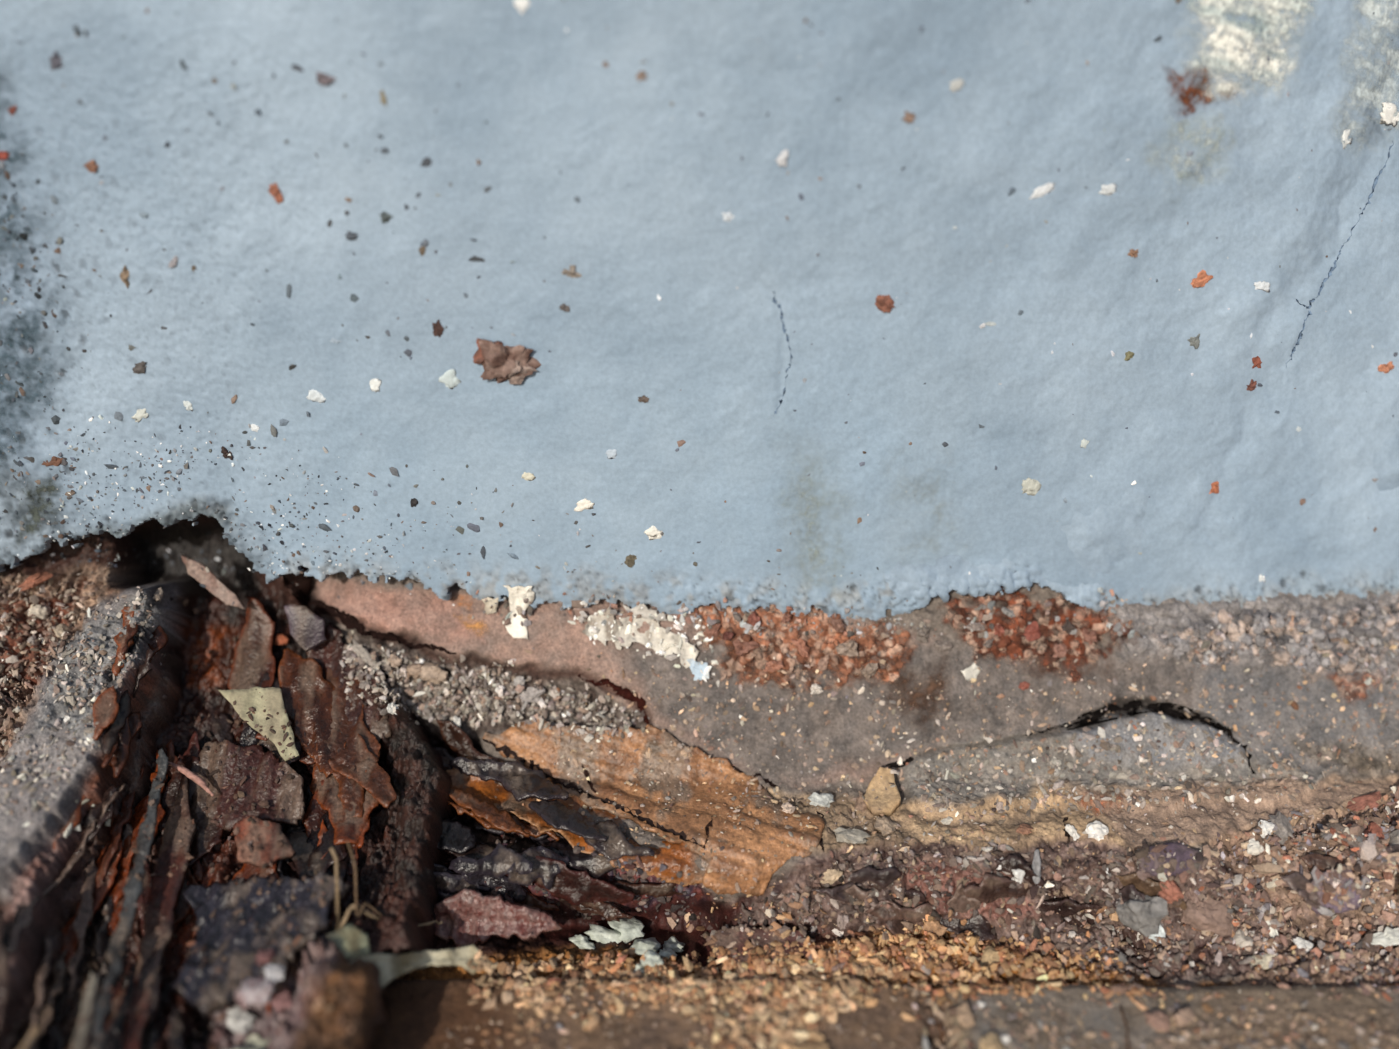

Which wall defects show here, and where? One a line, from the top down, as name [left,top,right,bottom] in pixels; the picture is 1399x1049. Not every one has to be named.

crack [1286,144,1394,368]
peeling [482,585,535,640]
spalling [345,633,448,684]
spalling [513,676,546,702]
peeling [218,687,299,762]
crack [884,756,914,769]
crack [1024,700,1256,774]